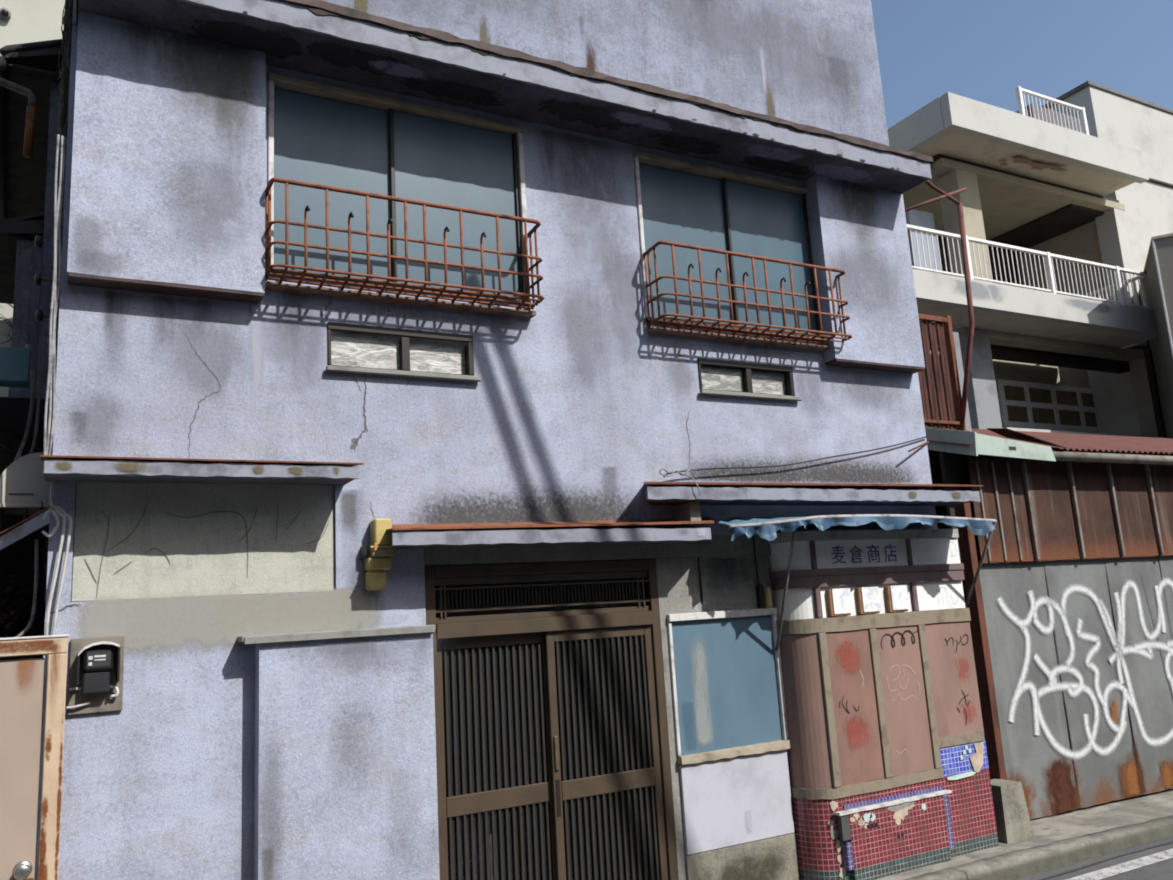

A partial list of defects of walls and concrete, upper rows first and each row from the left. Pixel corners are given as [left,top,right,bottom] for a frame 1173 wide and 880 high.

water stain [480,20,489,43]
water stain [761,55,775,117]
crack [185,334,221,459]
crack [350,375,368,449]
water stain [426,498,632,524]
corrosion [0,640,57,681]
corrosion [1111,700,1119,724]
corrosion [26,738,63,880]
corrosion [1048,760,1080,813]
corrosion [1120,744,1146,796]
corrosion [1161,762,1173,789]
spalling [828,801,926,879]